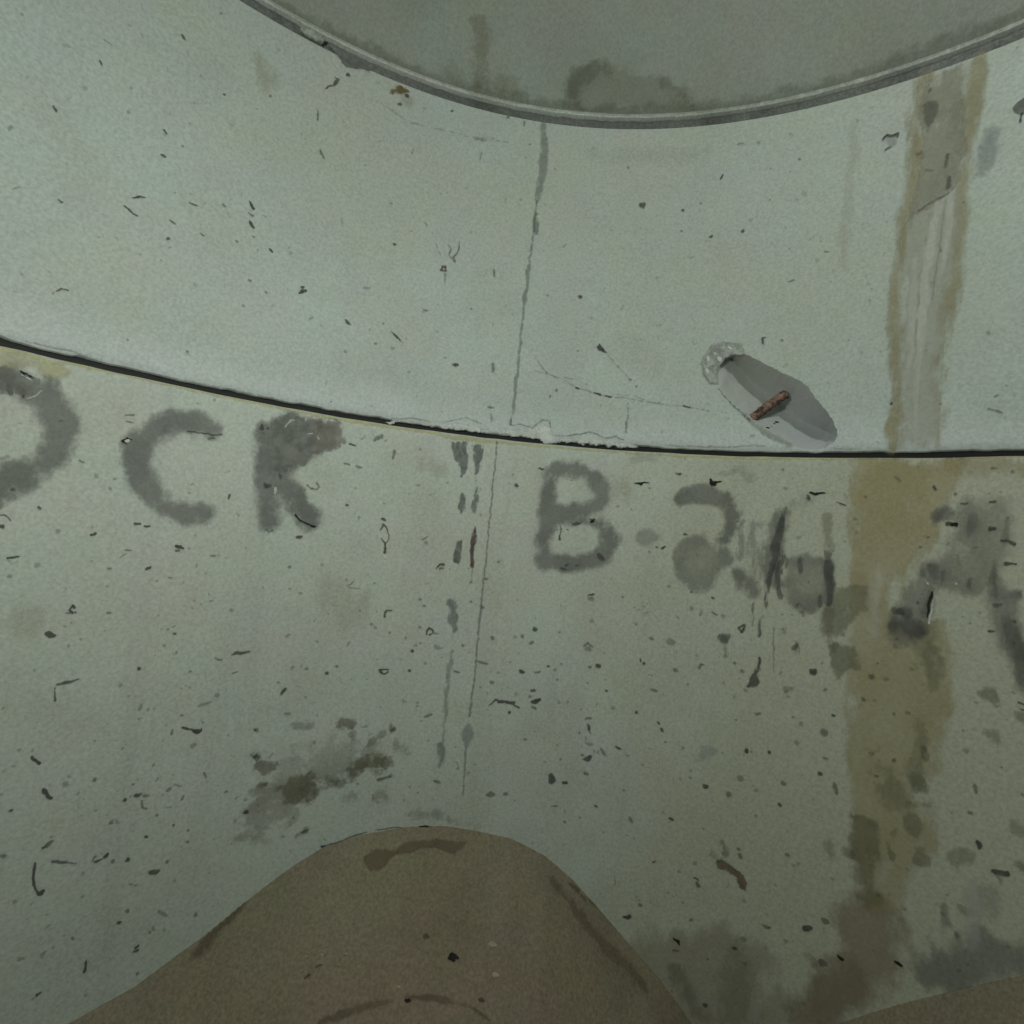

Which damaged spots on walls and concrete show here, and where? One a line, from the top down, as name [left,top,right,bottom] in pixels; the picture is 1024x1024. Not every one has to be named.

rust [749,390,789,420]
damp [849,458,963,591]